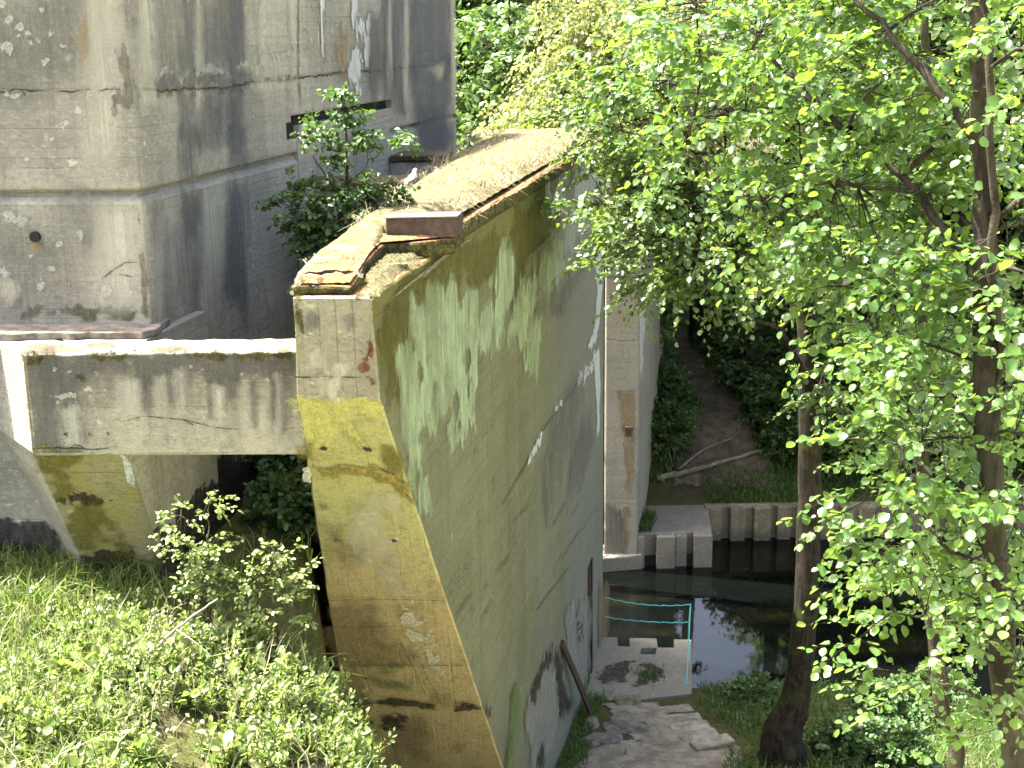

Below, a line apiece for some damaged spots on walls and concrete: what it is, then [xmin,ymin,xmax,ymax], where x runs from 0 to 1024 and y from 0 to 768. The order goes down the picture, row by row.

leakage [139,0,278,175]
crack [0,0,449,113]
leakage [184,183,249,323]
crack [127,416,238,430]
leakage [0,340,384,587]
rust [358,342,375,385]
leakage [396,159,598,515]
leakage [331,608,436,758]
leakage [453,701,492,718]
leakage [507,643,572,768]